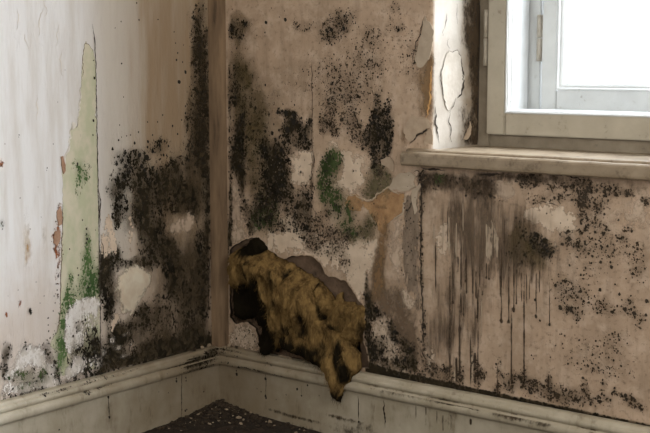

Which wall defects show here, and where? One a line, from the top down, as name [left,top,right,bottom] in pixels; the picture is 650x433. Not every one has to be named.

peeling [50,42,117,376]
leakage [0,3,238,400]
flaking render [229,288,262,350]
mould [227,1,427,275]
flaking render [271,140,421,305]
peeling [403,16,465,146]
crack [435,98,456,140]
leakage [363,170,650,413]